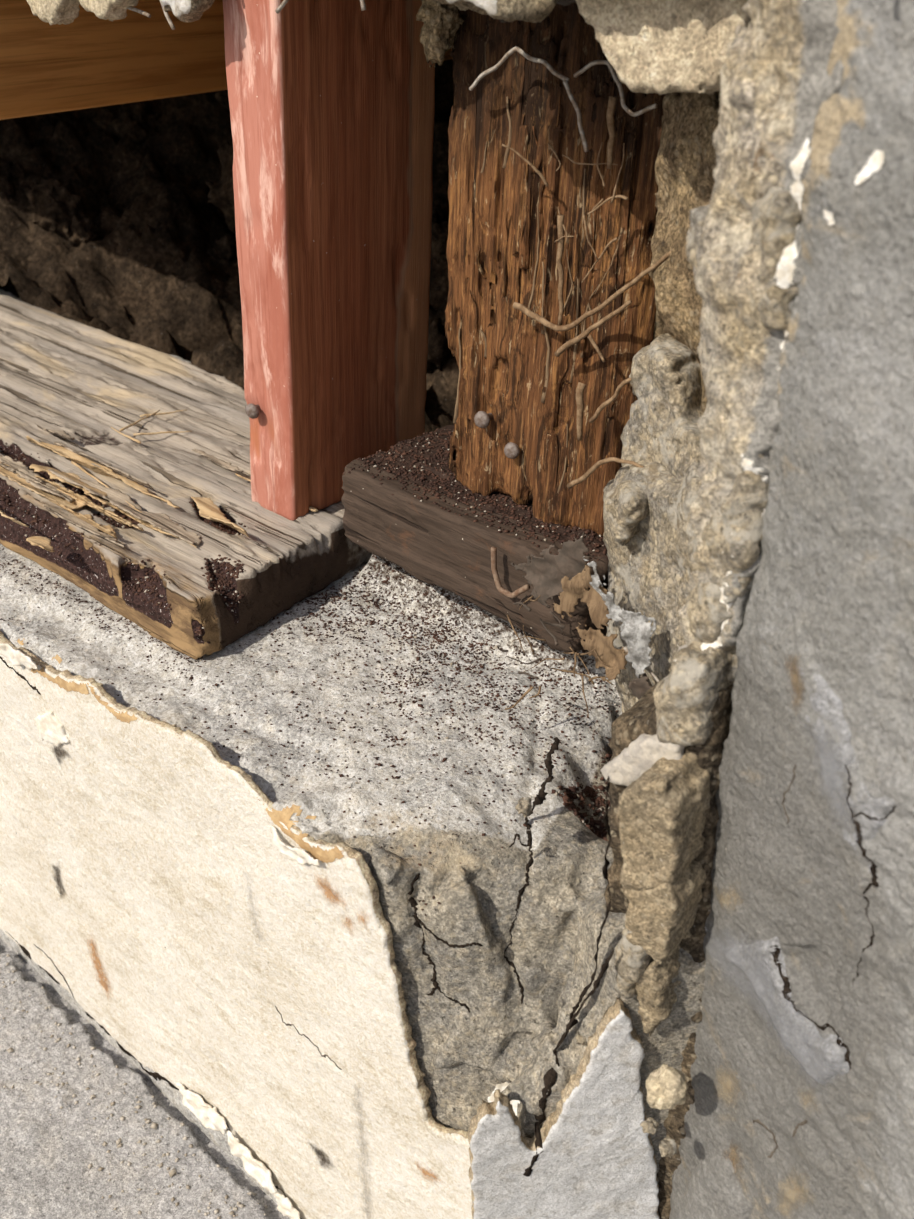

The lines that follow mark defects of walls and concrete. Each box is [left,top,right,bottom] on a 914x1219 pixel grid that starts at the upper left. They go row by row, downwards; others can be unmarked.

peeling [770,238,801,288]
peeling [719,571,732,625]
spalling [601,734,685,786]
spalling [259,800,706,1182]
crack [407,737,560,1013]
crack [523,775,614,1177]
crack [770,945,851,1070]
crack [845,764,895,985]